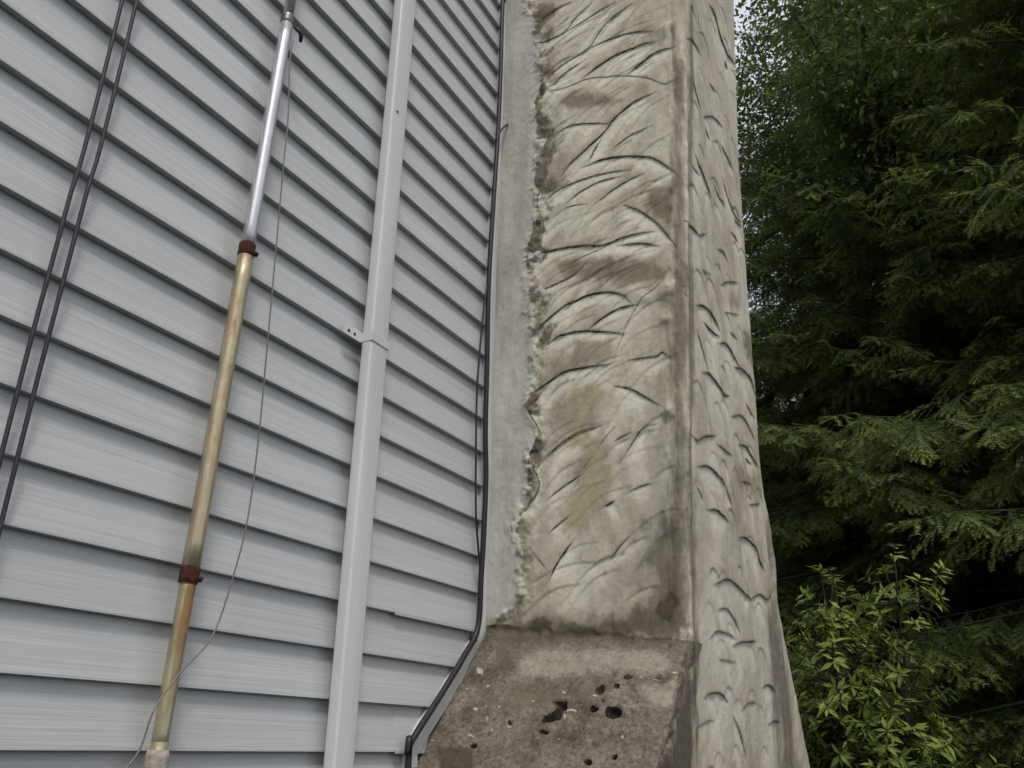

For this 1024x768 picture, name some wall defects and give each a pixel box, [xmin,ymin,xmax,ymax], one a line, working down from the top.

crack [525,1,742,511]
crack [693,305,762,566]
crack [535,517,574,580]
crack [712,579,768,662]
spalling [539,691,577,740]
spalling [518,647,679,719]
crack [698,685,782,751]